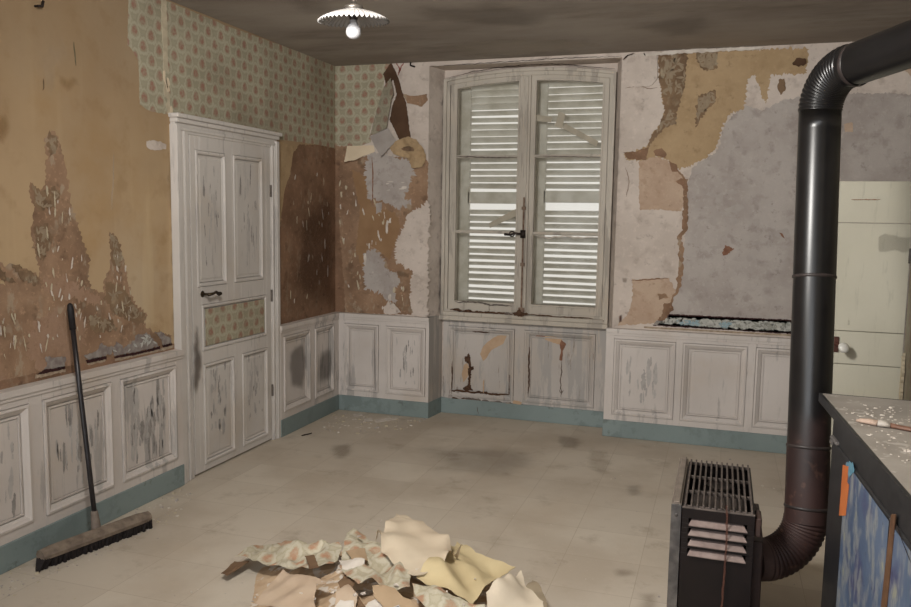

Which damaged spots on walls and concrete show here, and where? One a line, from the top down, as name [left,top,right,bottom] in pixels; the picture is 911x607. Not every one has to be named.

peeling [0,130,175,390]
peeling [127,0,431,324]
peeling [536,335,566,361]
flaking render [618,46,809,336]
flaking render [840,92,911,181]